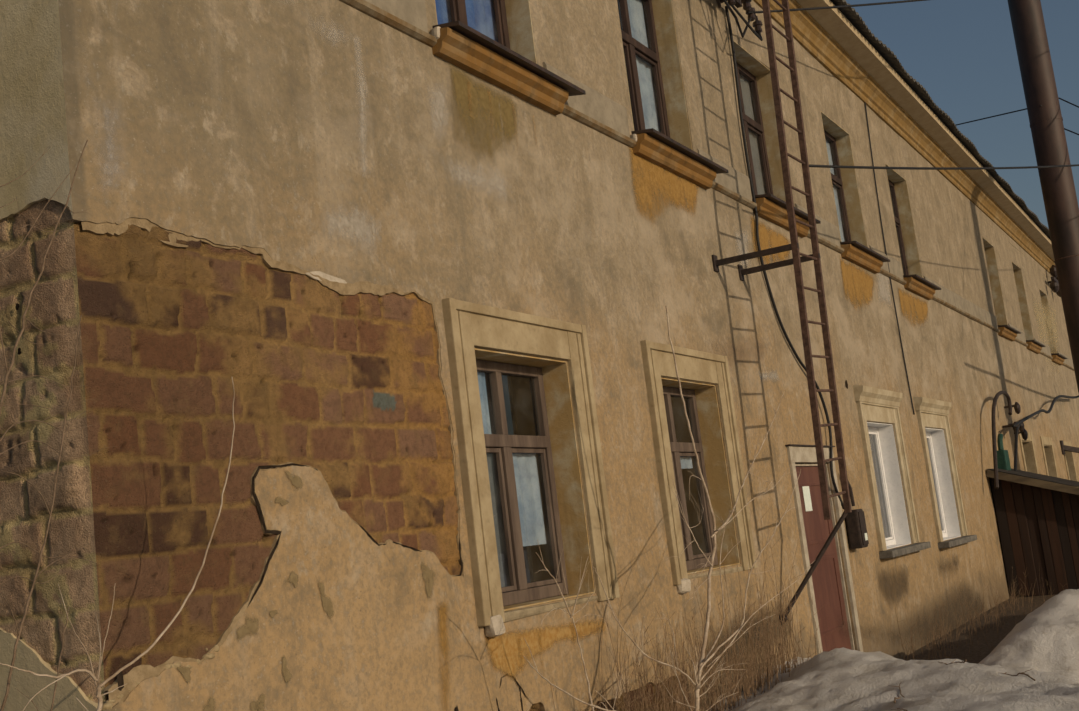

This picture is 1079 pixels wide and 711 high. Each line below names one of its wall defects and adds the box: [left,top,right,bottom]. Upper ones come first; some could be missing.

flaking render [0,199,463,711]
water stain [880,573,907,600]
flaking render [594,674,690,711]